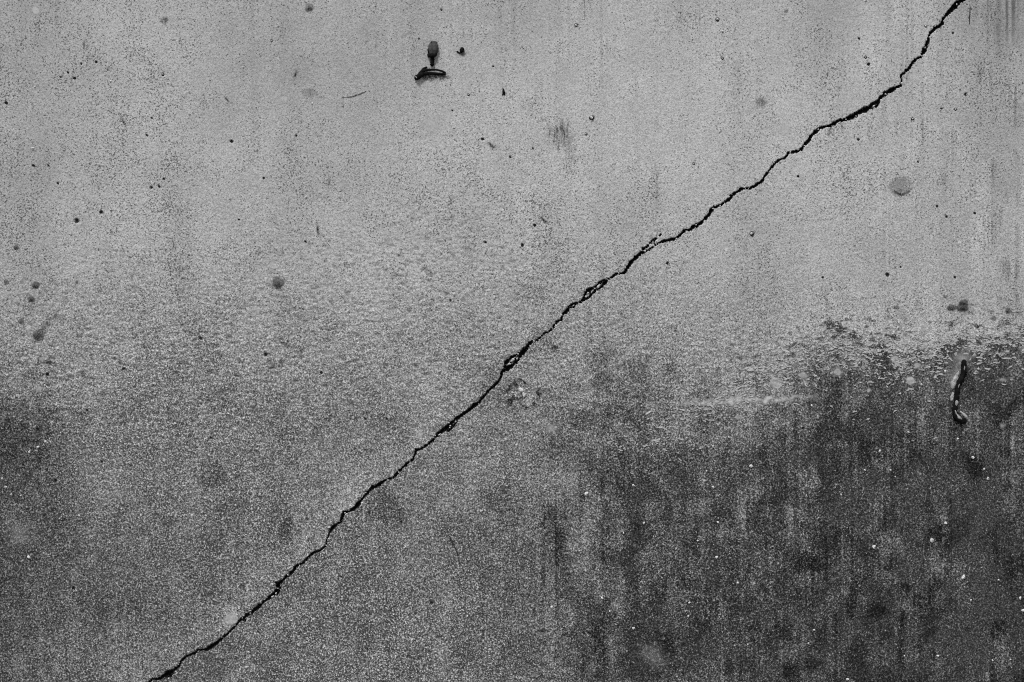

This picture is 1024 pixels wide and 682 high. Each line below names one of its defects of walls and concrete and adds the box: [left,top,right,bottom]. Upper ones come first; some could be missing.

water stain [0,320,1024,682]
crack [149,0,965,682]